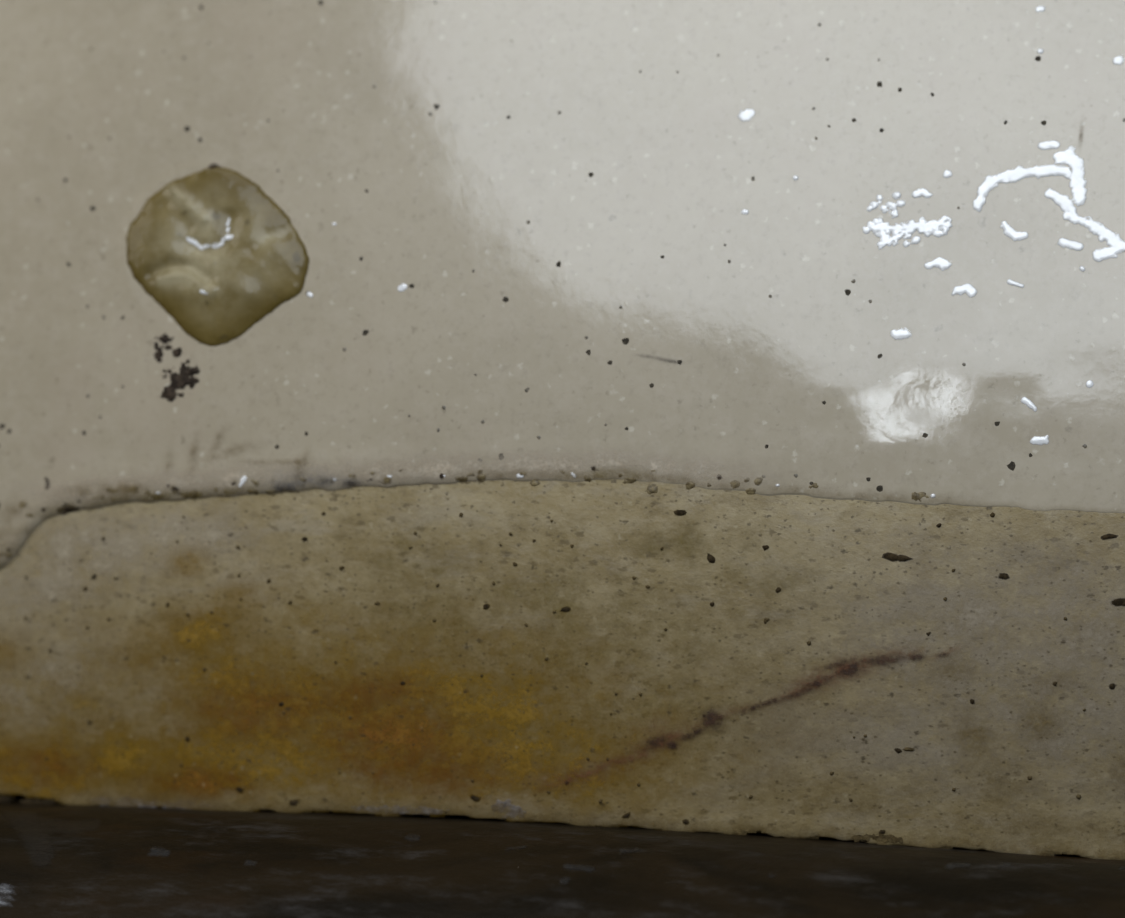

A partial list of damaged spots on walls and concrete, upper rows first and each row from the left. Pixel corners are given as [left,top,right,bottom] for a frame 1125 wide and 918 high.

spalling [882,552,913,562]
spalling [1110,598,1125,607]
peeling [91,796,214,809]
peeling [351,805,450,815]
peeling [852,830,903,843]